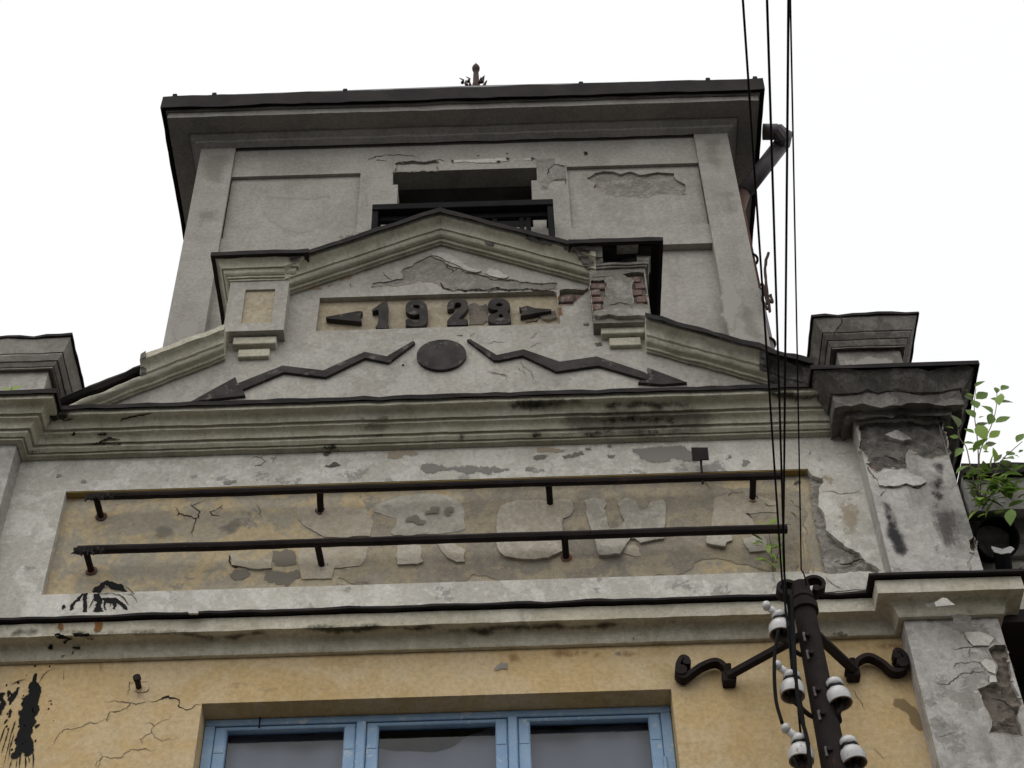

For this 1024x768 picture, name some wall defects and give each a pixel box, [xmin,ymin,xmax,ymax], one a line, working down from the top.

flaking render [586,171,687,198]
flaking render [371,252,649,325]
water stain [512,399,577,409]
mould [584,402,687,440]
peeling [388,449,509,475]
flaking render [857,418,951,488]
crack [173,500,222,537]
flaking render [229,476,878,592]
water stain [884,503,906,554]
crack [941,632,989,685]
flaking render [964,631,1024,737]
crack [52,681,200,766]